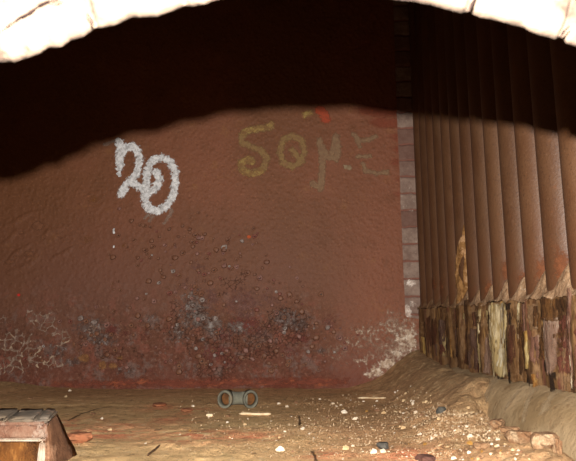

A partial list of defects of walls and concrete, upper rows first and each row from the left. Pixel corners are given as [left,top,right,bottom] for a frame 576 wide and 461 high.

damp [356,301,420,378]